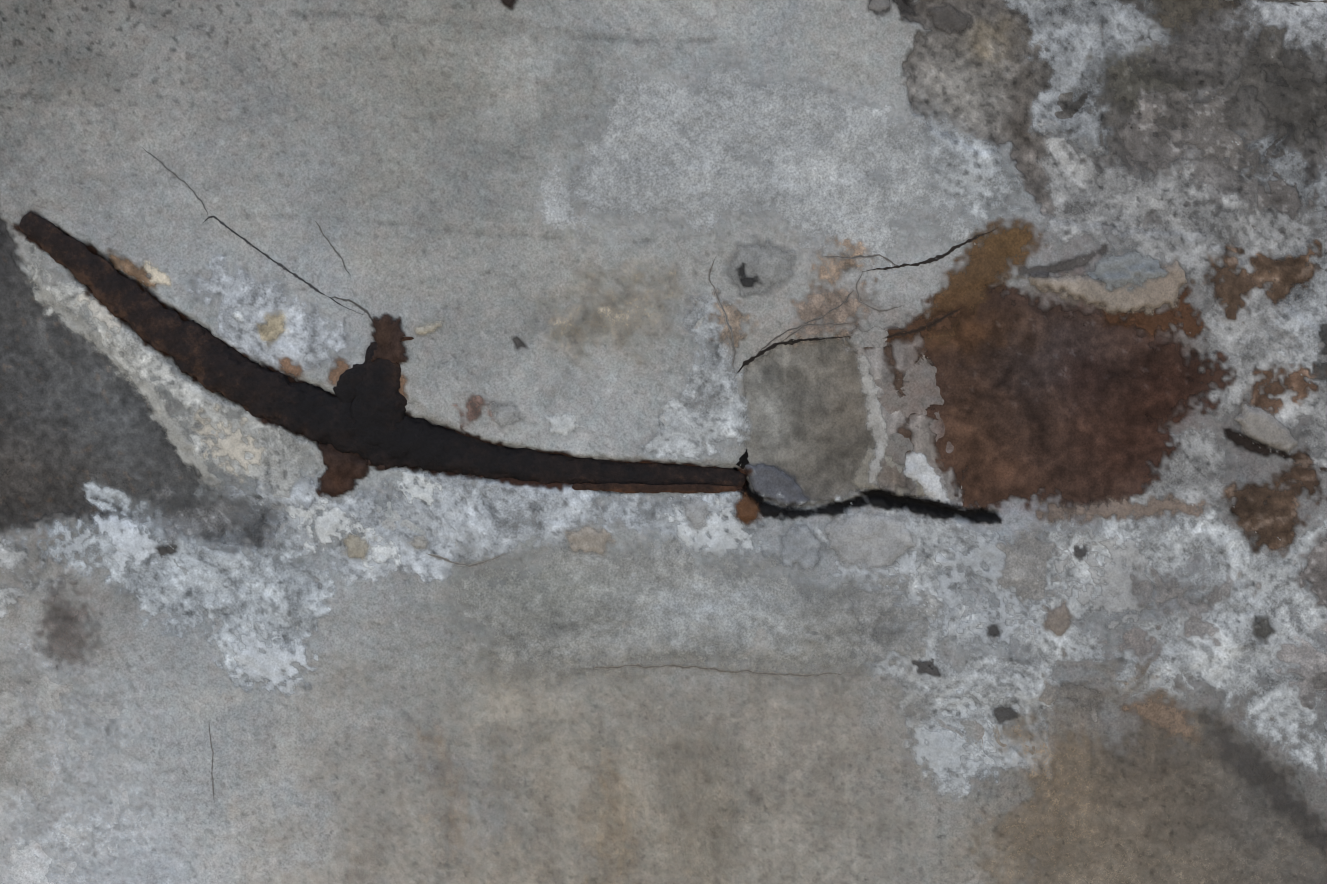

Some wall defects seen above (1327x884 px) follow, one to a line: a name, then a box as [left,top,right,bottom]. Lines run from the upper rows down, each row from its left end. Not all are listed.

peeling [868,0,1327,255]
rust [13,211,752,497]
damp [0,241,777,696]
rust [791,239,868,343]
crack [708,227,998,373]
crack [733,449,1002,525]
damp [814,0,1327,796]
rust [864,219,1326,556]
peeling [1019,244,1187,315]
peeling [1224,404,1298,458]
spalling [912,659,941,677]
flaking render [1044,601,1073,636]